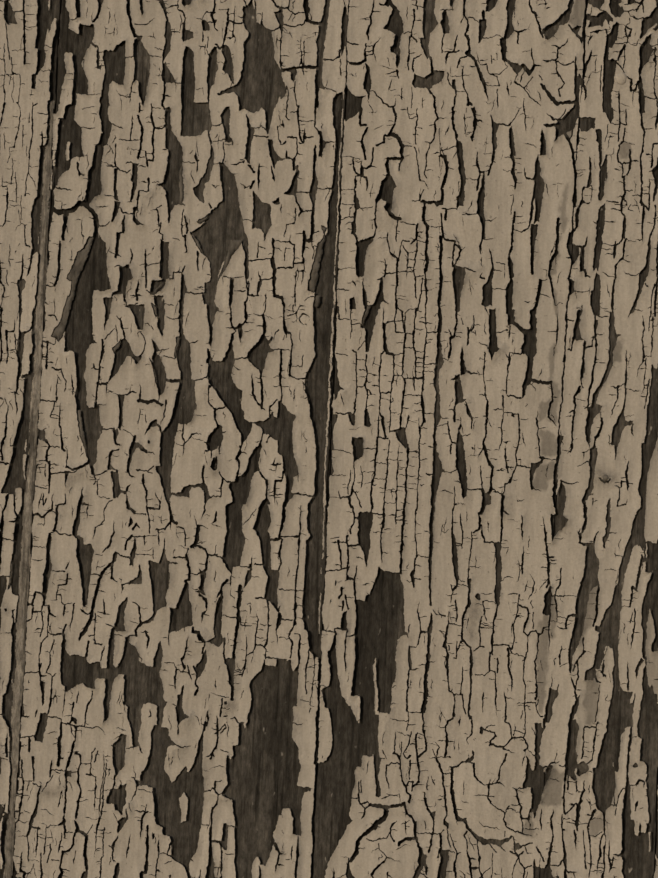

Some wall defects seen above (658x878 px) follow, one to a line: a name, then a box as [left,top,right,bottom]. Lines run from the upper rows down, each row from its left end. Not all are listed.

peeling [584,56,596,88]
peeling [274,241,294,269]
peeling [395,241,426,334]
peeling [414,291,427,358]
peeling [357,360,367,386]
crack [0,0,323,878]
peeling [375,334,423,520]
peeling [340,543,348,568]
peeling [511,606,528,657]
peeling [417,734,426,755]
peeling [583,727,596,752]
peeling [504,809,522,832]